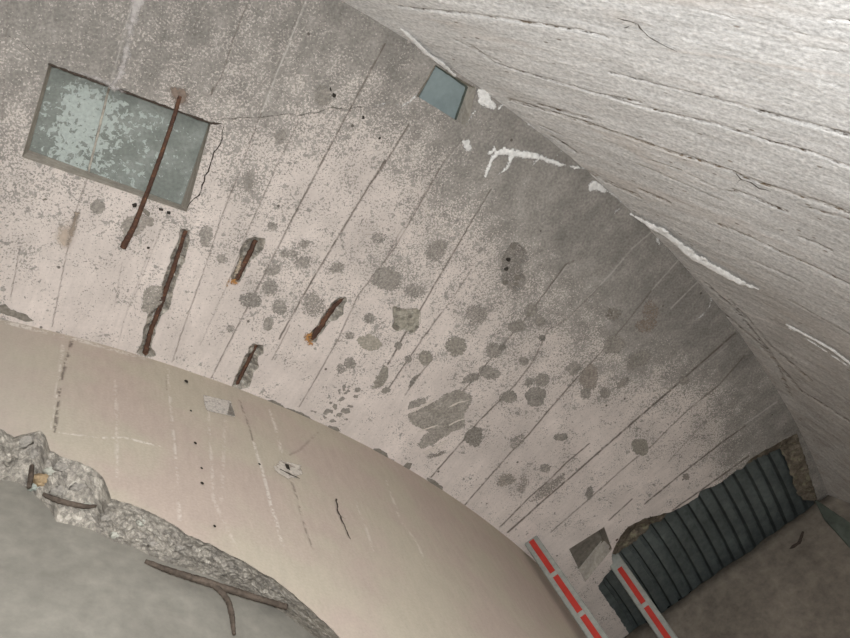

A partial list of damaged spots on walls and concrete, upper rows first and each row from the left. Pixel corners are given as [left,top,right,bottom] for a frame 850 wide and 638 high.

crack [617,18,677,52]
crack [187,106,361,208]
efflorescence [484,146,584,177]
efflorescence [629,213,760,290]
spalling [136,225,213,357]
efflorescence [785,324,850,367]
peeling [631,439,648,456]
spalling [746,434,818,501]
spalling [0,428,340,638]
spalling [609,513,667,554]